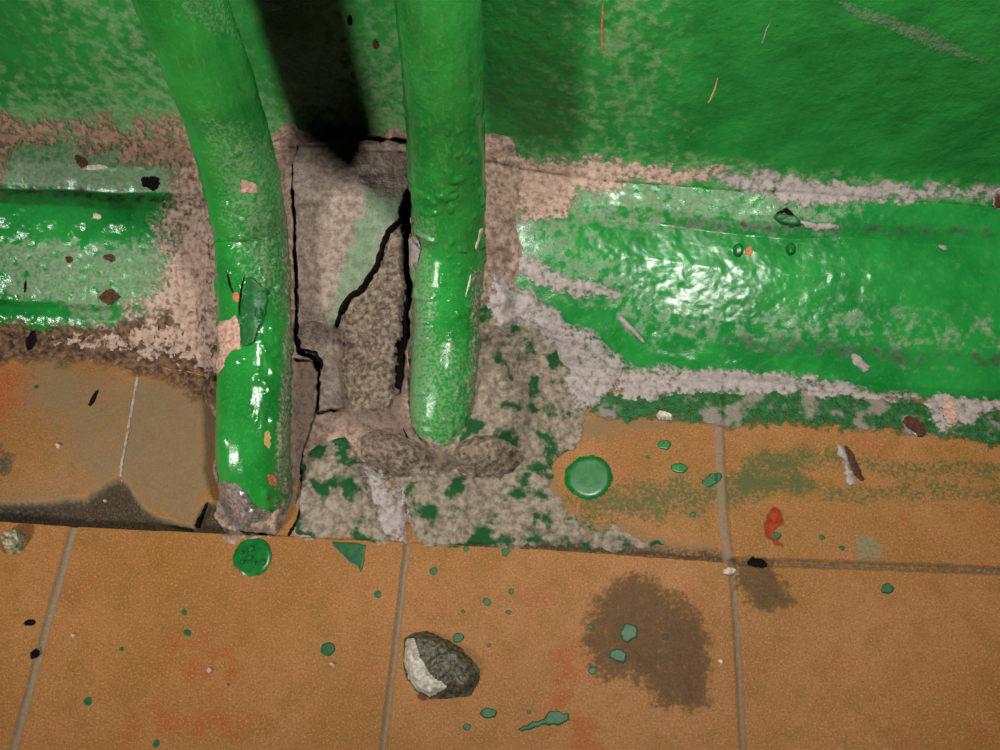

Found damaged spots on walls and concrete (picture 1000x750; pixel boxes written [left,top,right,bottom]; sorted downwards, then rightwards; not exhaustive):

peeling [74,155,107,170]
spalling [99,132,270,374]
crack [294,194,324,398]
crack [335,193,413,389]
spalling [340,217,413,412]
peeling [773,208,839,232]
peeling [992,188,1000,209]
spalling [454,299,588,471]
spalling [903,416,926,436]
spalling [941,395,957,424]
crack [287,508,301,536]
leakage [584,572,710,707]